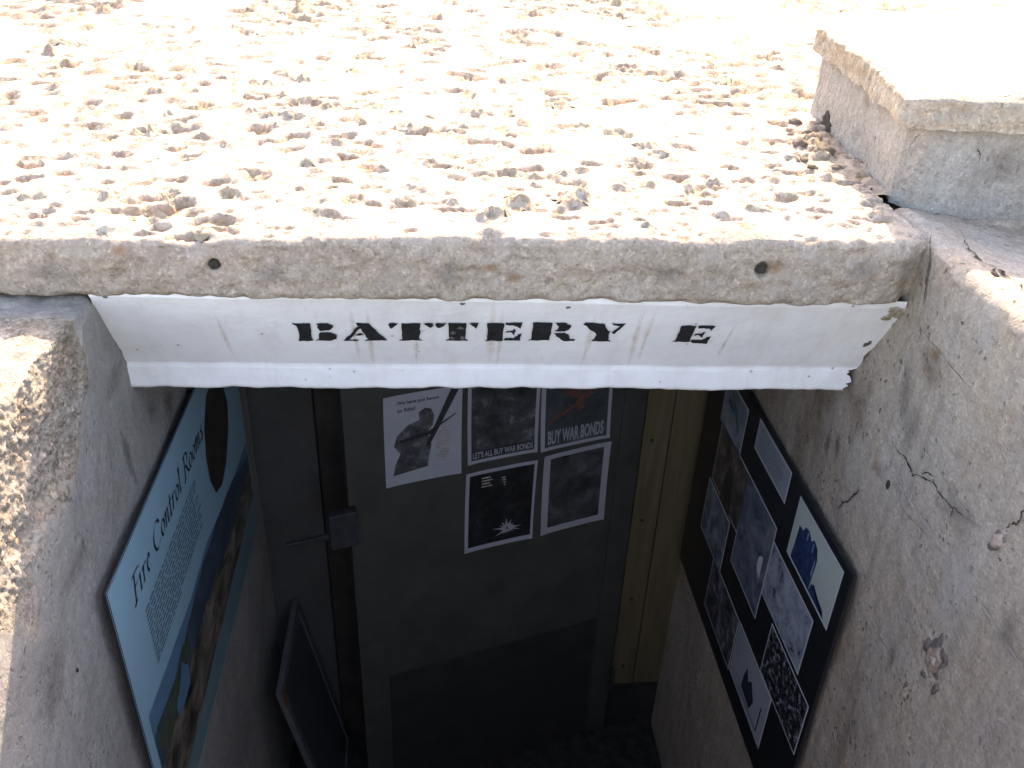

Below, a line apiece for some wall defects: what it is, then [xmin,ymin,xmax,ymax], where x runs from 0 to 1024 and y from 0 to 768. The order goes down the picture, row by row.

crack [963,235,1023,288]
crack [891,441,981,527]
spalling [920,618,949,695]